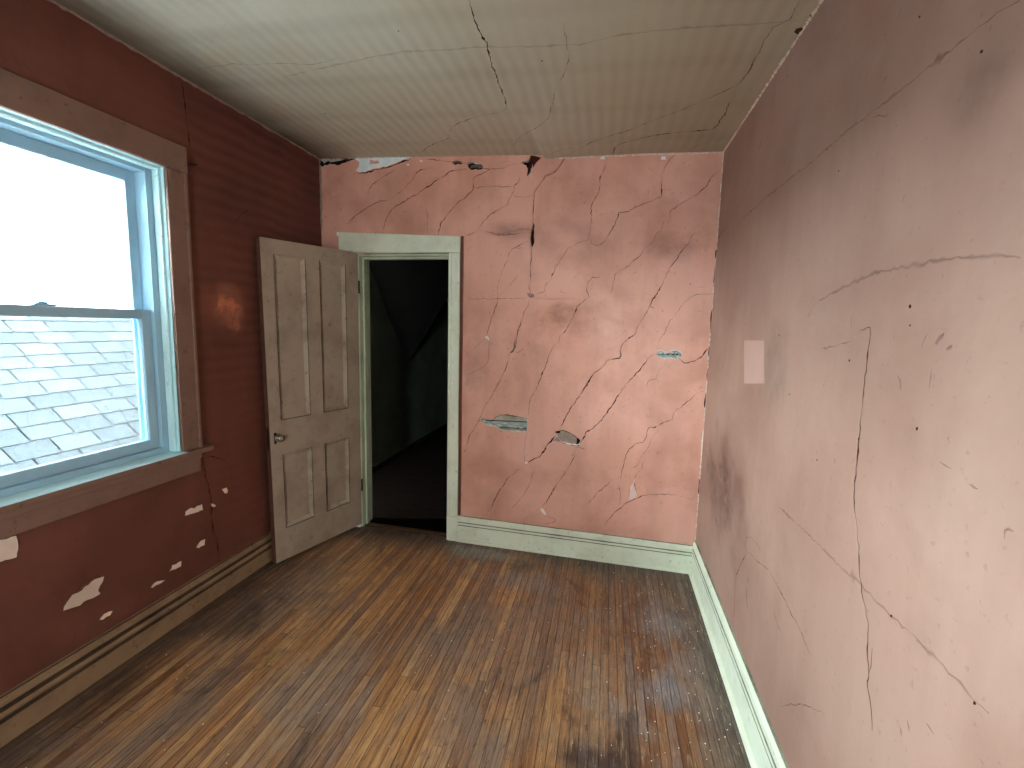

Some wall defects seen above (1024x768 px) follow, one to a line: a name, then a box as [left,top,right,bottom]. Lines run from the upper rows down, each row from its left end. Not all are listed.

peeling [320,157,422,174]
crack [348,1,795,525]
flaking render [656,349,682,360]
flaking render [481,414,528,432]
flaking render [553,430,583,449]
peeling [185,503,216,516]
crack [852,327,872,730]
peeling [0,534,20,564]
peeling [149,560,182,589]
peeling [63,575,105,612]